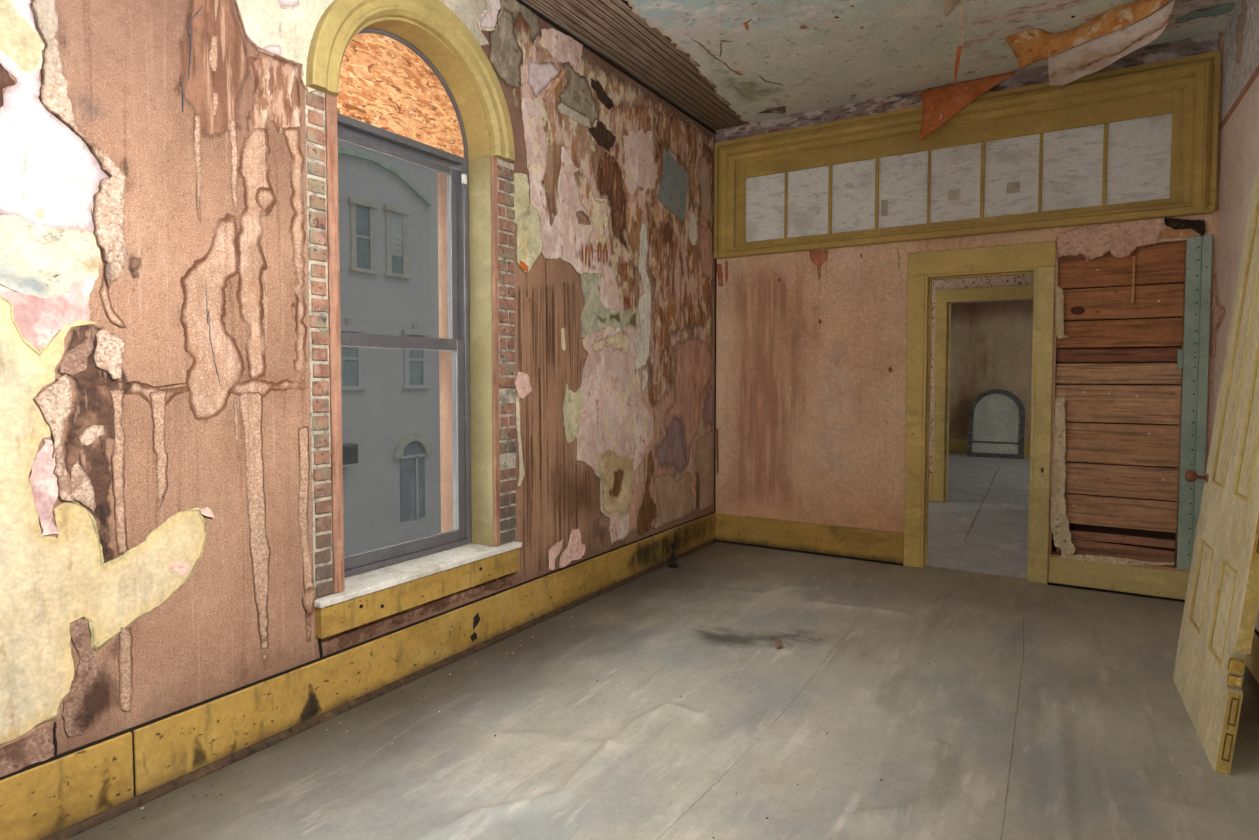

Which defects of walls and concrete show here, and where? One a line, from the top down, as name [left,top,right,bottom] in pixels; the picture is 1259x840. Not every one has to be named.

peeling [0,0,110,235]
peeling [0,276,215,744]
peeling [548,529,586,570]
peeling [497,28,712,545]